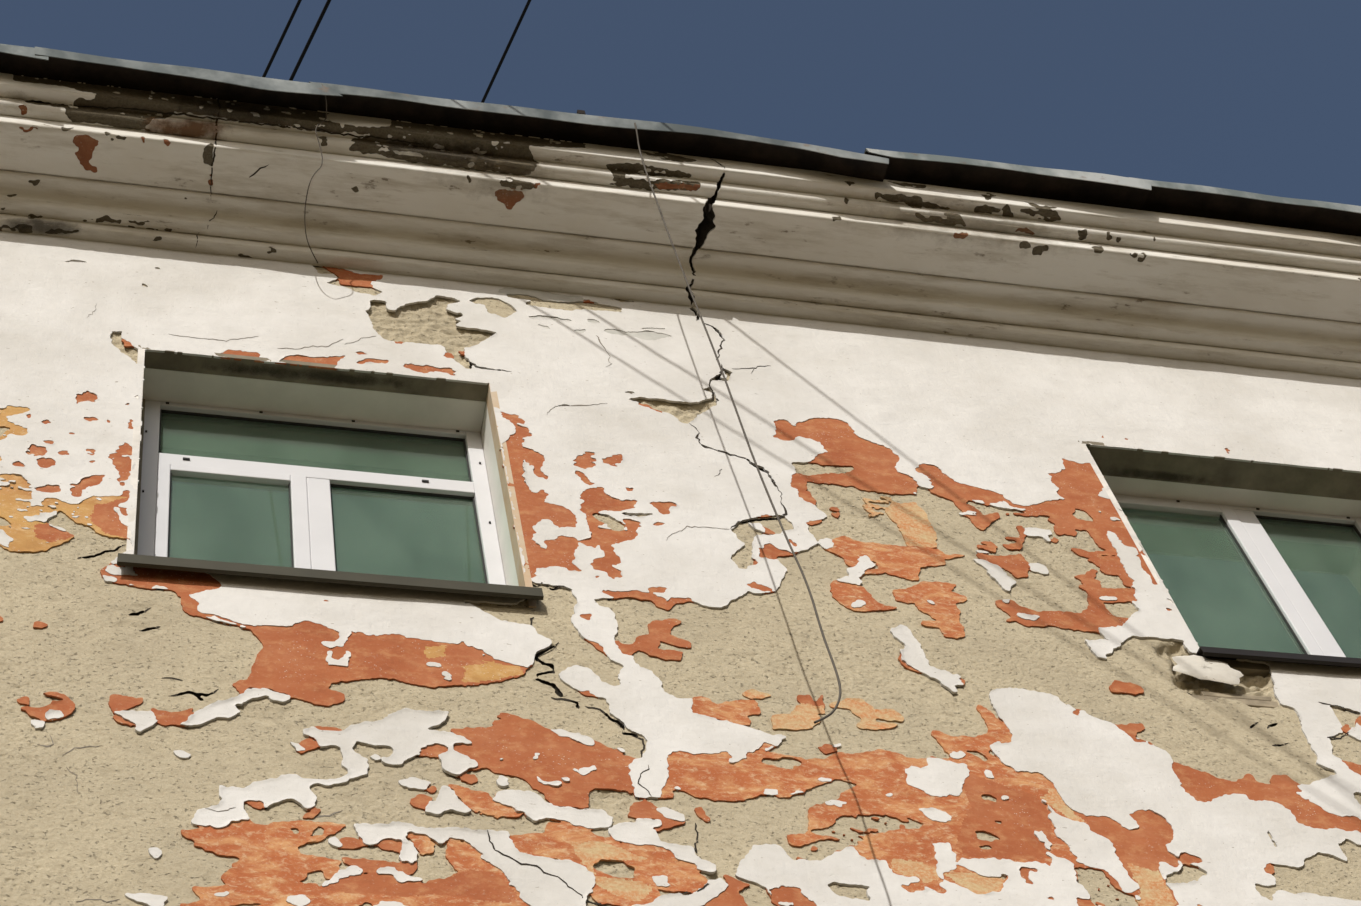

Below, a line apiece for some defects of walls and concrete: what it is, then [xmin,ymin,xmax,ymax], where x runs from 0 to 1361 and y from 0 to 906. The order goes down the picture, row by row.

peeling [0,178,172,241]
flaking render [110,333,138,364]
crack [26,99,422,246]
flaking render [13,75,586,210]
flaking render [219,266,671,376]
flaking render [631,371,731,424]
crack [685,158,769,401]
peeling [875,180,1061,255]
peeling [1078,230,1121,254]
crack [667,423,788,539]
crack [530,582,651,795]
flaking render [0,391,1361,906]